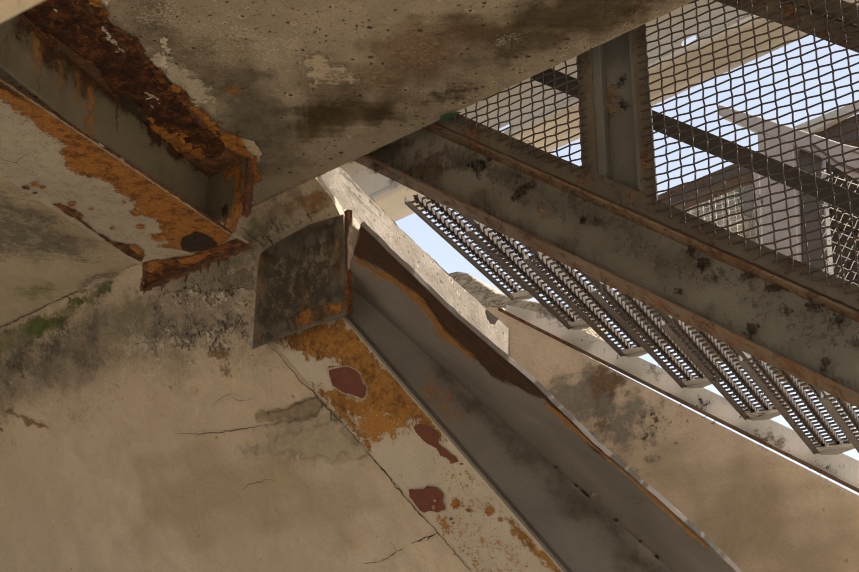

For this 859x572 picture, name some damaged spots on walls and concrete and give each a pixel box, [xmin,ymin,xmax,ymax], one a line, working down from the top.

damp [371,0,645,87]
rust [0,0,263,292]
spalling [240,138,262,163]
mould [136,271,255,366]
crack [176,424,267,435]
peeling [329,366,366,398]
crack [267,343,471,571]
rust [273,296,560,572]
peeling [414,424,463,465]
rust [354,227,708,548]
damp [549,368,688,472]
peeling [409,486,455,524]